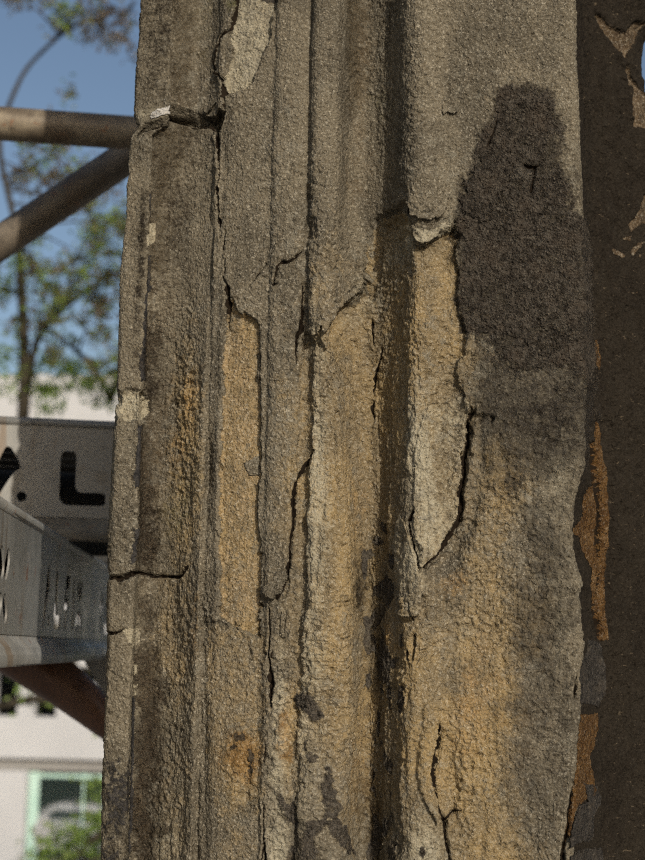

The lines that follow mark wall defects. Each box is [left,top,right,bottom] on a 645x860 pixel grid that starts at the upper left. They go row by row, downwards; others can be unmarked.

crack [213,0,240,108]
crack [146,121,233,329]
crack [255,251,302,285]
crack [295,287,305,361]
spalling [308,178,469,616]
crack [408,412,493,568]
crack [110,566,188,582]
spalling [205,300,288,846]
crack [267,449,314,707]
peeling [417,702,439,824]
crack [430,722,462,860]